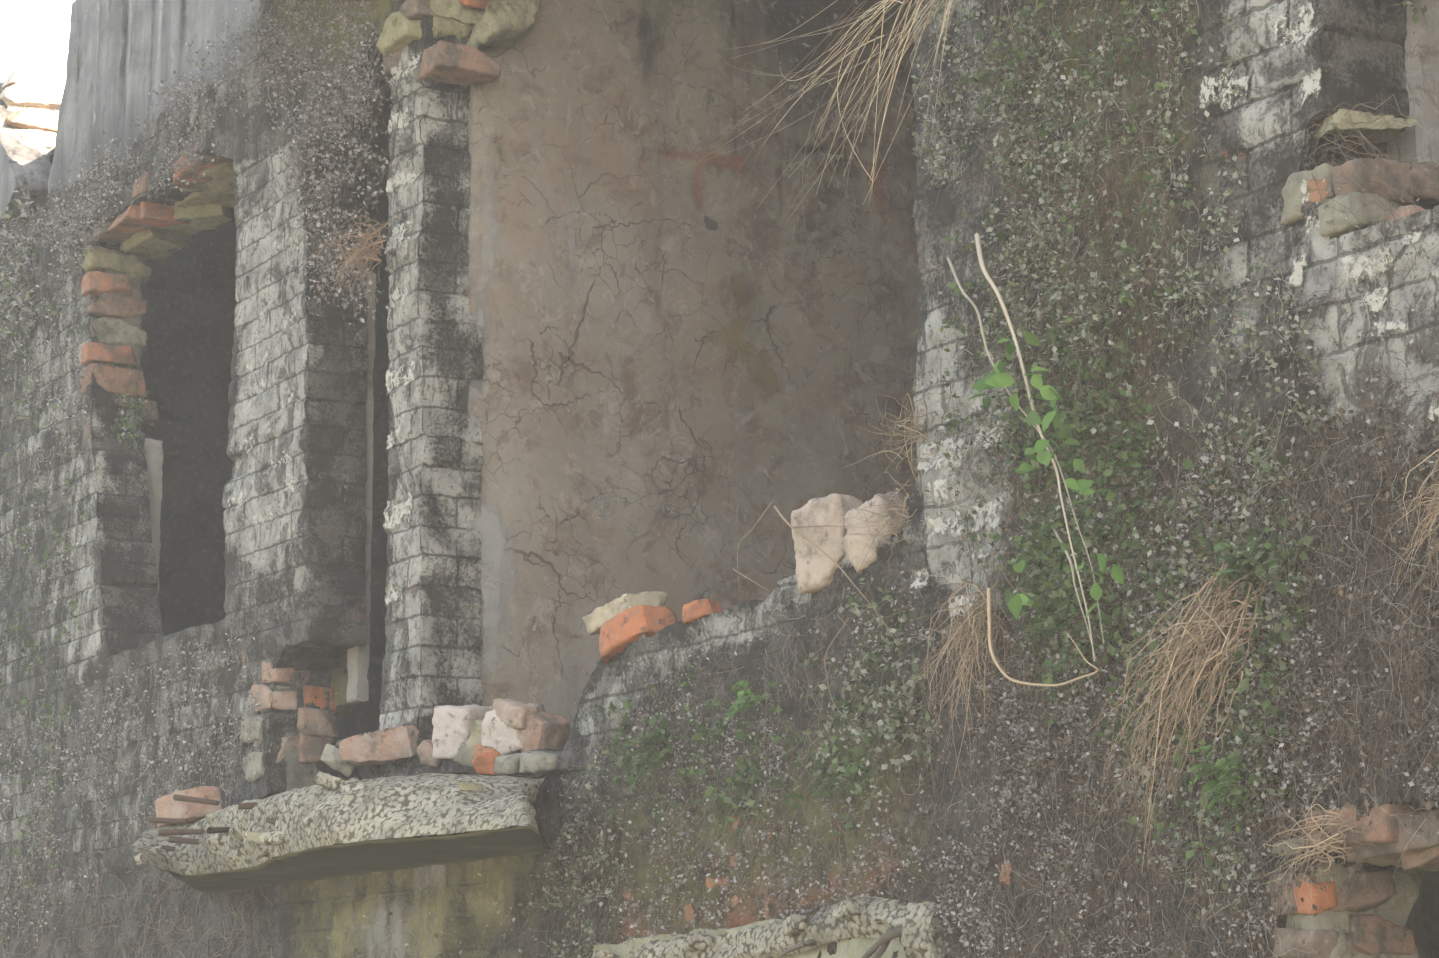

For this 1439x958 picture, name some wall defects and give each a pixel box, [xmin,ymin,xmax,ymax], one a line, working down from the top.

crack [591,218,695,298]
crack [482,273,623,437]
crack [692,300,798,389]
crack [661,409,721,565]
crack [505,531,591,675]
spalling [131,649,570,875]
spalling [705,853,744,905]
spalling [591,895,945,958]